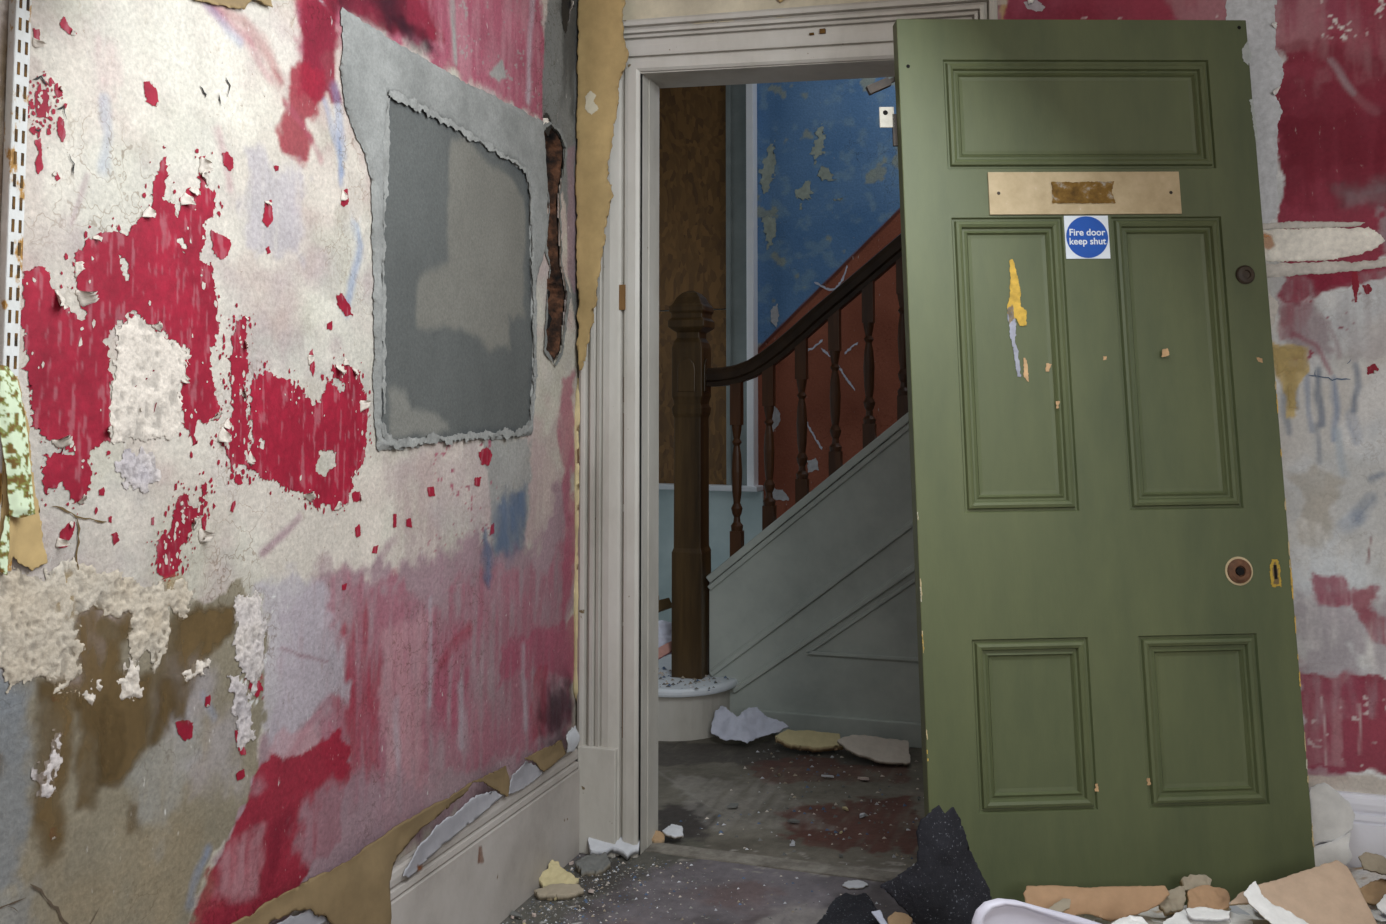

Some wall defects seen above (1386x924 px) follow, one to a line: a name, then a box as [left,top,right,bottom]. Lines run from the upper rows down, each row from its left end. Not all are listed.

peeling [20,146,372,585]
peeling [474,447,492,486]
spalling [543,118,572,366]
leakage [35,606,235,854]
peeling [175,720,194,741]
peeling [235,730,246,781]